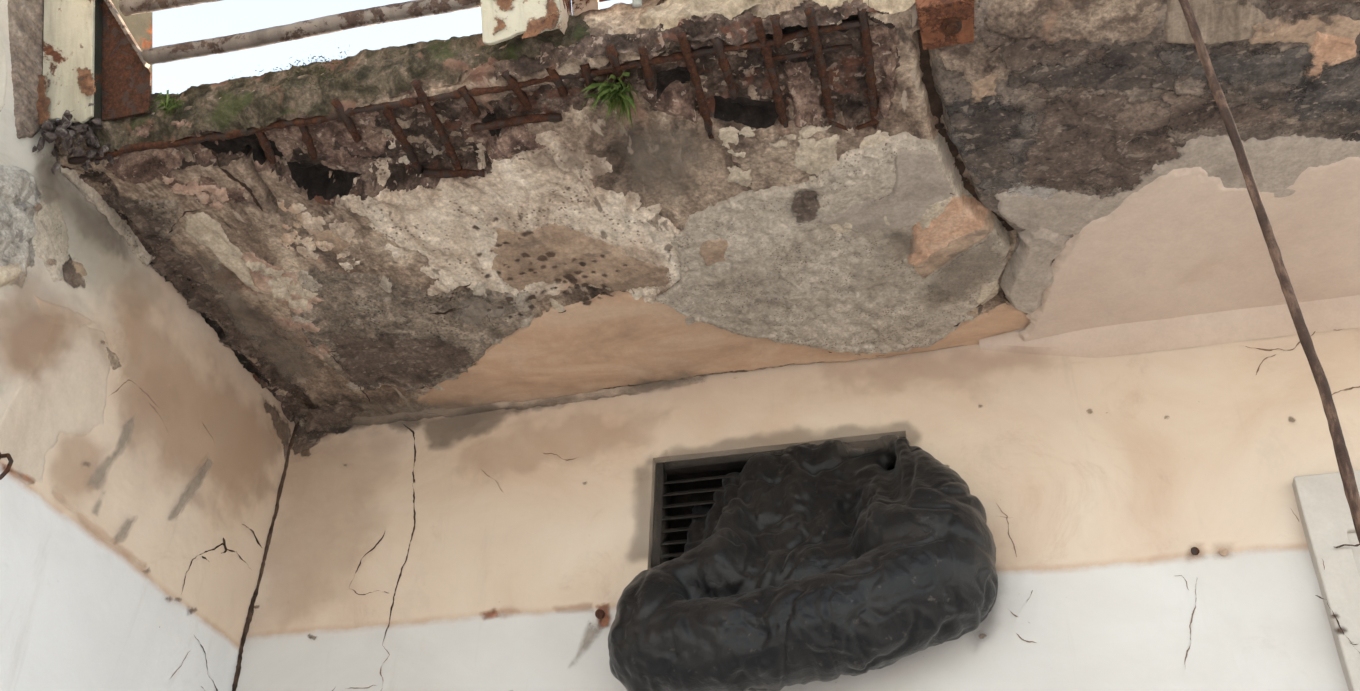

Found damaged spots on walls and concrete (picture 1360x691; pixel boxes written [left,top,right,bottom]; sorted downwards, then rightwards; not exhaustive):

flaking render [937,0,1162,103]
flaking render [1249,0,1360,80]
flaking render [7,0,1031,406]
peeling [0,295,122,486]
water stain [62,255,85,288]
spalling [200,312,316,425]
water stain [105,189,698,459]
crack [1246,329,1342,375]
water stain [91,419,133,513]
water stain [170,459,212,519]
crack [172,421,299,691]
crack [332,427,416,691]